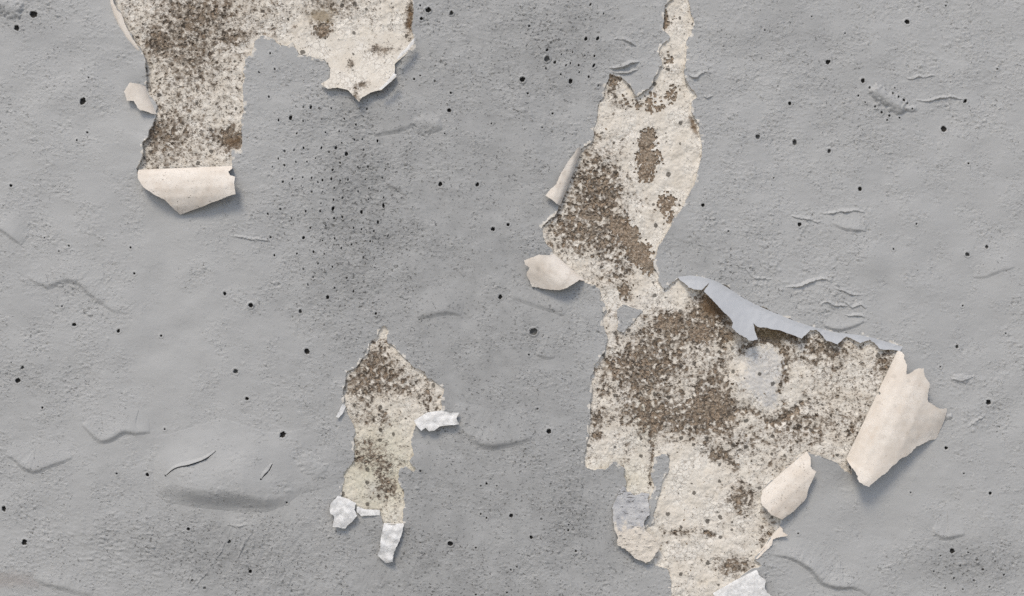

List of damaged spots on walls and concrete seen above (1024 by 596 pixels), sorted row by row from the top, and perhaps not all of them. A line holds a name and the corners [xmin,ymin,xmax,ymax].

peeling [110,0,415,214]
peeling [524,0,947,596]
peeling [330,326,459,563]